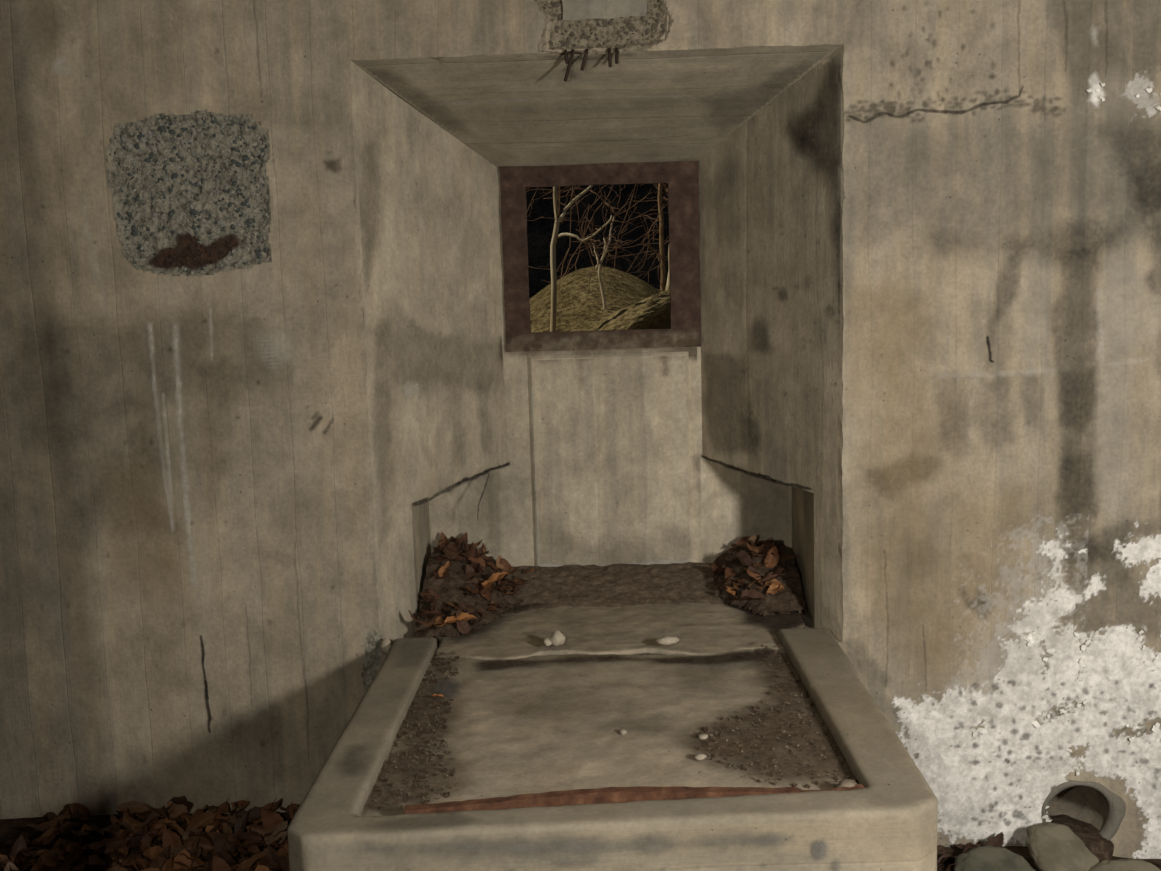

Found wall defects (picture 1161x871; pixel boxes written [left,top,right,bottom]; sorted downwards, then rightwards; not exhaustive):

spalling [535,0,674,55]
crack [852,96,1018,121]
spalling [105,110,272,276]
corrosion [150,233,240,270]
crack [200,636,211,732]